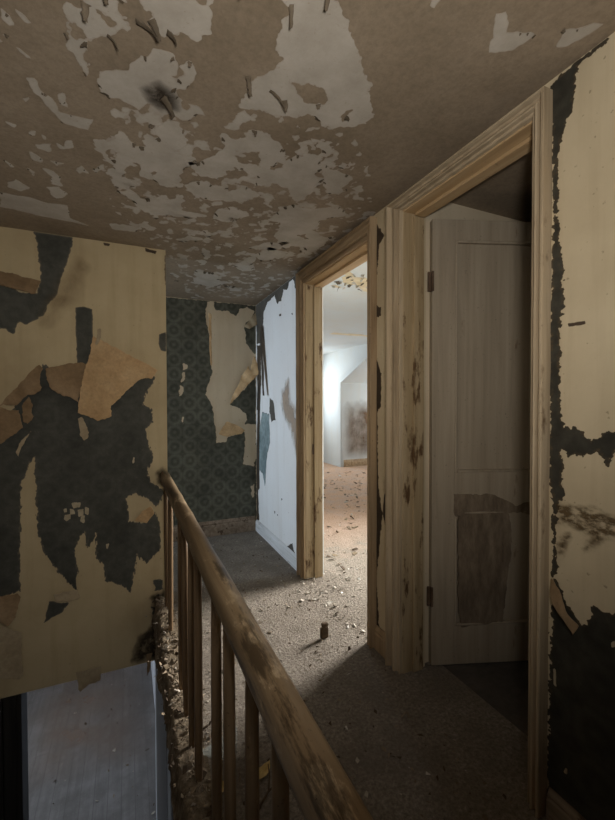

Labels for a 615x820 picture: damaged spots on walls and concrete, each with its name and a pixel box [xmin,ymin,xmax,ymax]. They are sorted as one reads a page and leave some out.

peeling [0,8,31,42]
peeling [23,77,93,130]
water stain [146,86,175,109]
peeling [62,0,375,271]
peeling [0,131,89,226]
peeling [193,269,241,291]
peeling [332,271,367,292]
water stain [349,409,367,452]